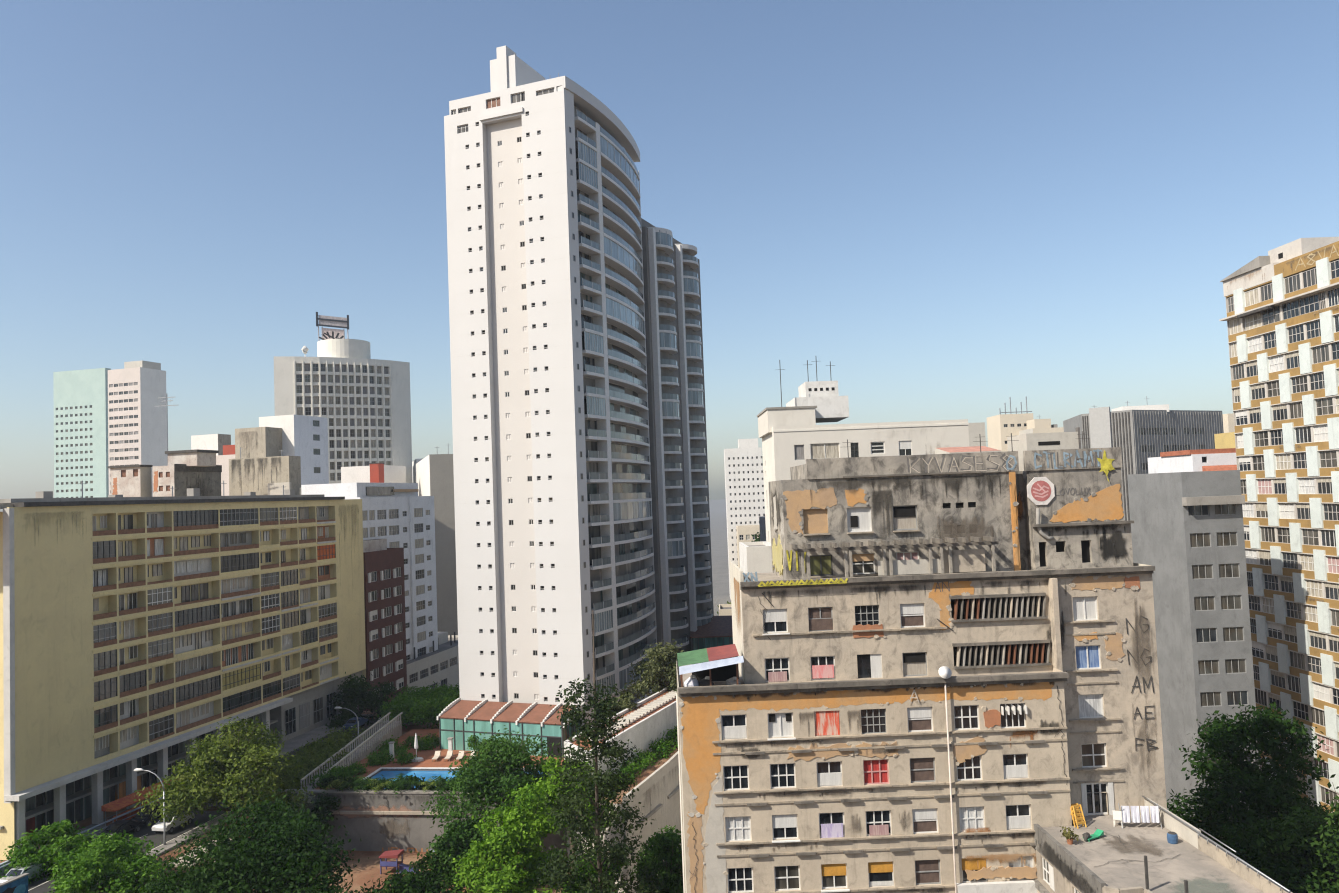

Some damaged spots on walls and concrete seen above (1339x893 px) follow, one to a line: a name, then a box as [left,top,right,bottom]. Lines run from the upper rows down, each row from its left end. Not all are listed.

damp [810,474,1001,534]
peeling [1050,484,1124,523]
peeling [772,487,869,576]
damp [938,517,993,541]
damp [1043,525,1127,559]
peeling [929,581,974,630]
peeling [679,682,1054,893]